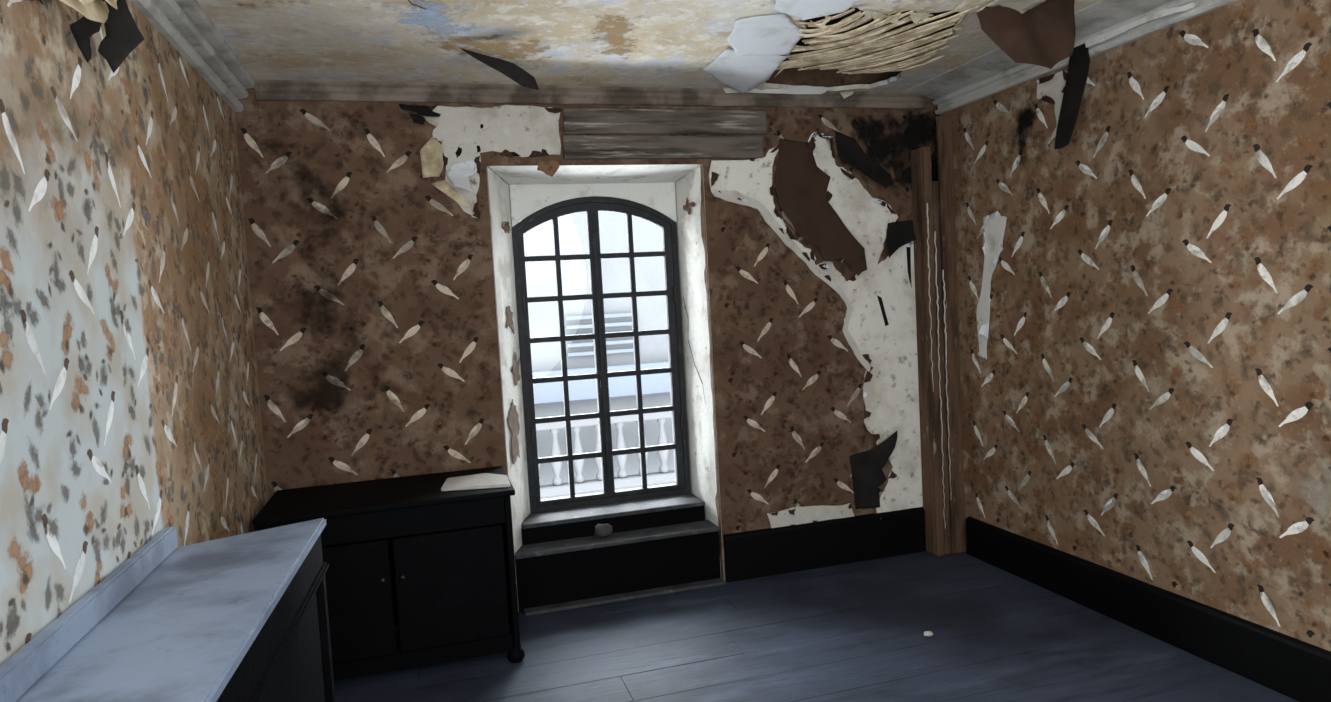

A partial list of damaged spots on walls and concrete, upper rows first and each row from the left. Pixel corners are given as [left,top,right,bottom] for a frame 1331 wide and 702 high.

water stain [442,35,549,59]
peeling [703,0,933,98]
flaking render [1085,2,1195,48]
peeling [529,149,559,177]
peeling [770,185,831,282]
peeling [982,211,999,266]
spalling [904,242,914,288]
spalling [877,295,889,326]
peeling [978,322,989,339]
peeling [862,354,873,419]